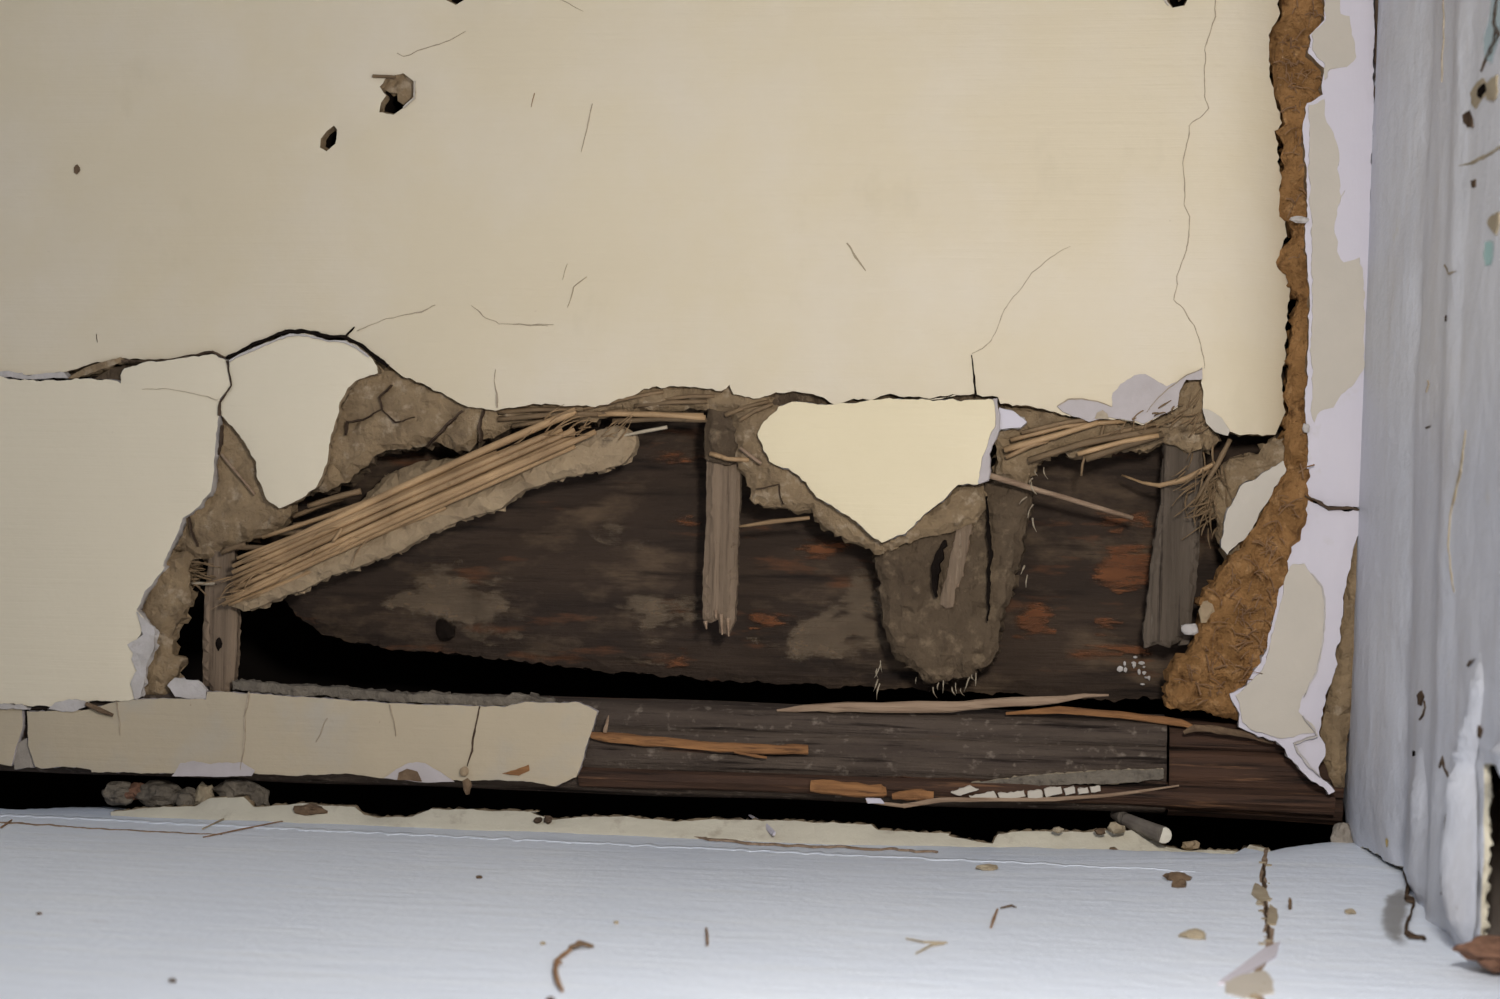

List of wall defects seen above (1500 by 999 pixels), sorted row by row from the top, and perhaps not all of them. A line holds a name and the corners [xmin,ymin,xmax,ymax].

peeling [1462,75,1499,128]
crack [1173,0,1216,369]
peeling [1487,212,1500,235]
crack [0,305,435,416]
crack [471,305,554,326]
spalling [127,0,1365,788]
crack [971,247,1068,396]
crack [467,706,481,766]
peeling [951,768,1164,798]
crack [1438,755,1449,778]
crack [1218,848,1280,999]
crack [1368,849,1442,941]